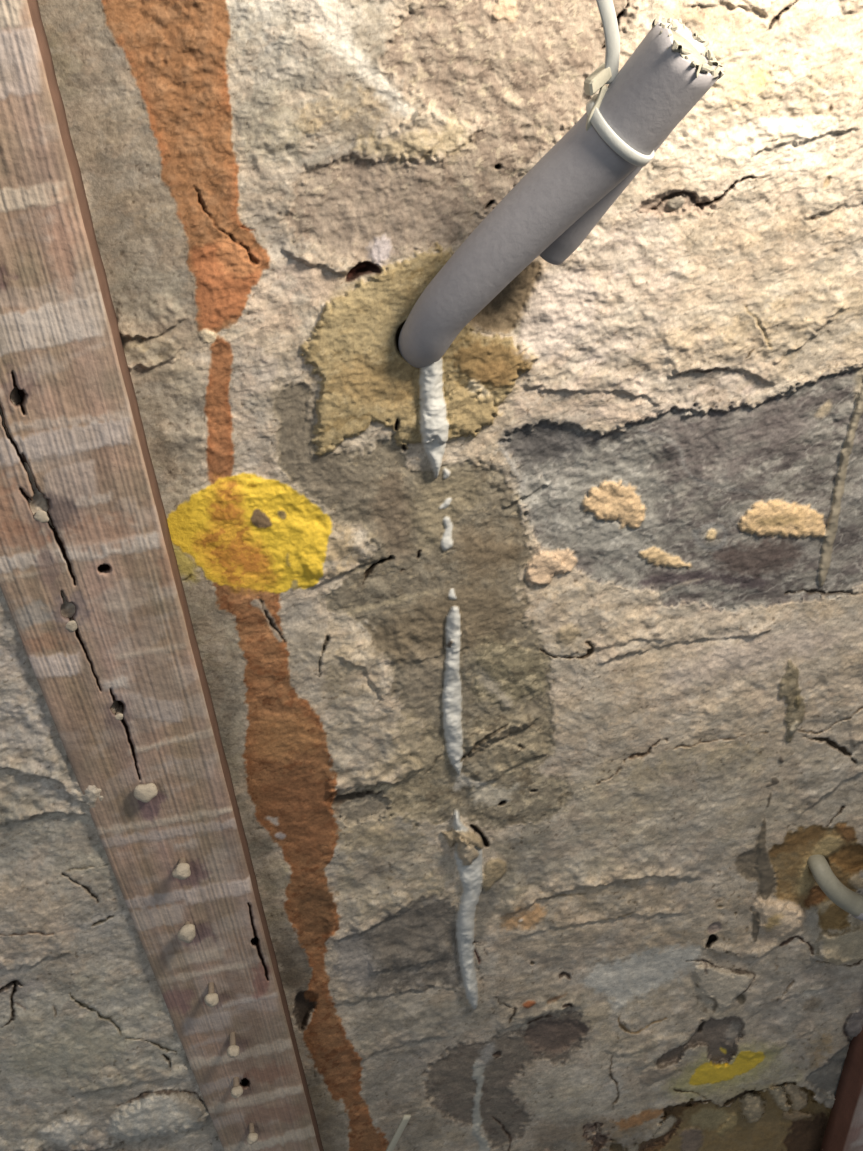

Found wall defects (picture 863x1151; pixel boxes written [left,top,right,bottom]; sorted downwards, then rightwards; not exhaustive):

crack [761,0,803,33]
crack [632,174,772,224]
corrosion [99,0,390,1151]
crack [596,706,863,785]
crack [60,863,116,928]
crack [0,979,205,1108]